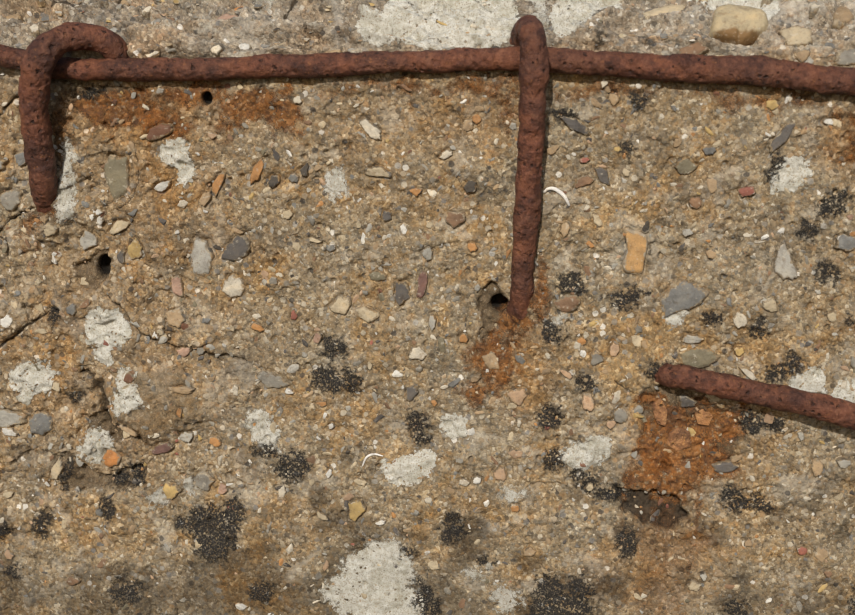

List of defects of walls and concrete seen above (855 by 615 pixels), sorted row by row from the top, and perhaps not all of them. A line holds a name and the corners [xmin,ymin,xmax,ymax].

corrosion [51,80,305,156]
corrosion [451,73,520,123]
corrosion [832,109,855,163]
spalling [76,249,110,289]
crack [0,303,47,347]
spalling [478,282,513,347]
corrosion [461,257,551,408]